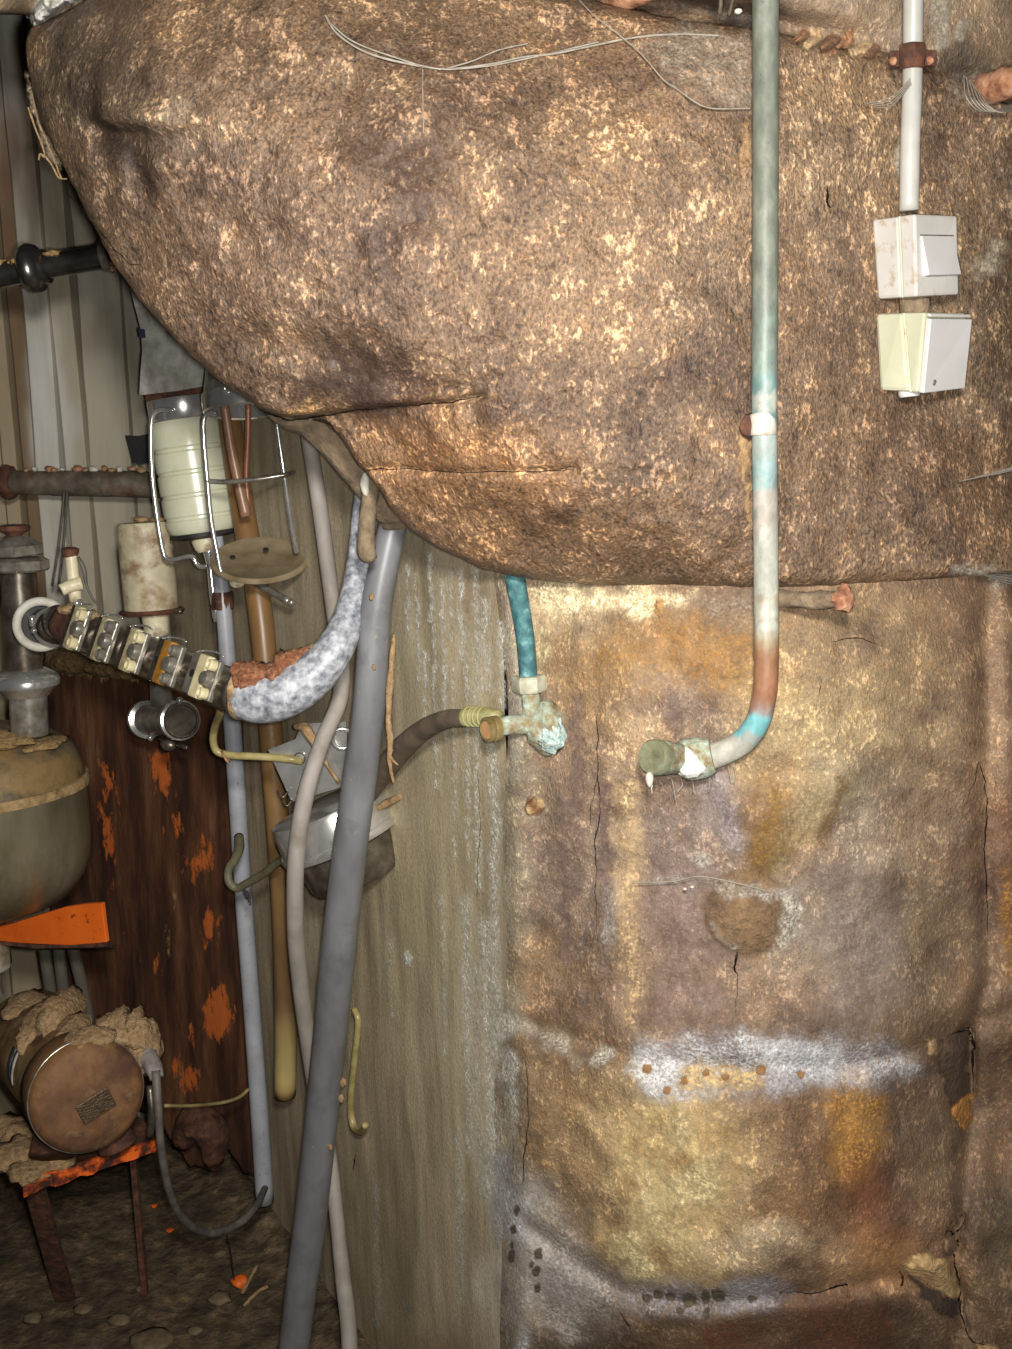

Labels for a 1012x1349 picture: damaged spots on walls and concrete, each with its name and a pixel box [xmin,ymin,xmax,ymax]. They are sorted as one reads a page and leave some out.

damp [404,552,506,717]
damp [433,689,918,1348]
crack [952,1027,976,1093]
rust [826,1081,885,1207]
crack [767,1284,848,1294]
crack [946,1214,985,1345]